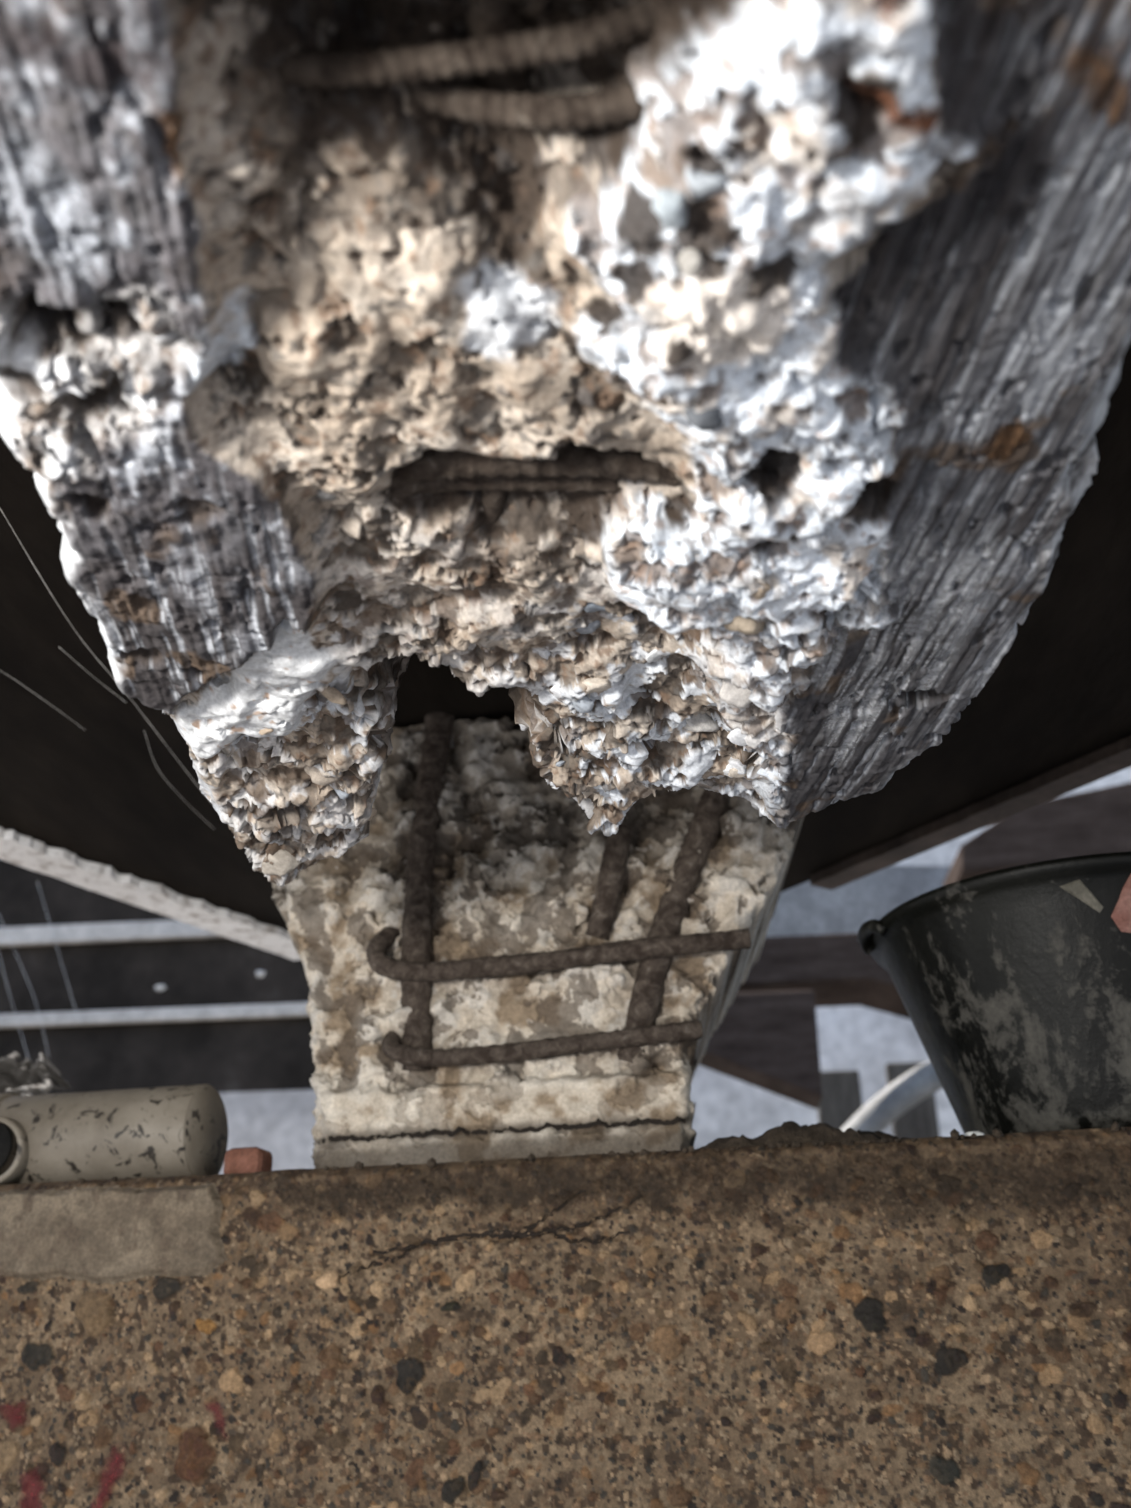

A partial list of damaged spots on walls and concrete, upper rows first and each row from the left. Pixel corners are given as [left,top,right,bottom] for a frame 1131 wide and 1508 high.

rust [873,0,899,19]
rust [848,76,940,134]
spalling [821,156,982,288]
leakage [566,0,1000,821]
spalling [57,0,942,1092]
spalling [971,278,1131,698]
crack [338,1190,639,1278]